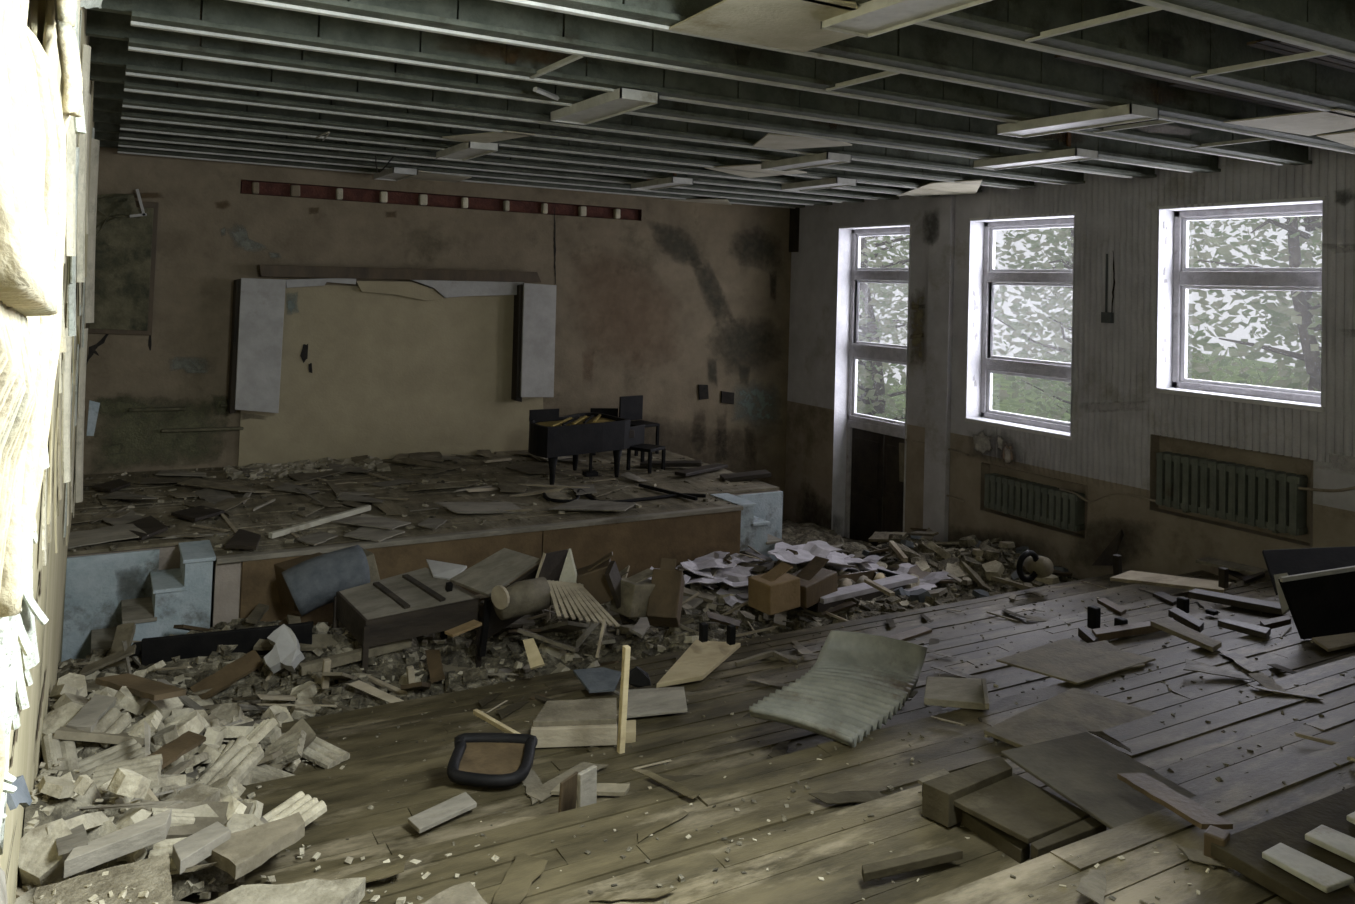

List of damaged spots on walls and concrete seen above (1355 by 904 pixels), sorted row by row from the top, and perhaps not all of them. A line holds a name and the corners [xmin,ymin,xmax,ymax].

peeling [0,0,140,855]
water stain [654,226,776,383]